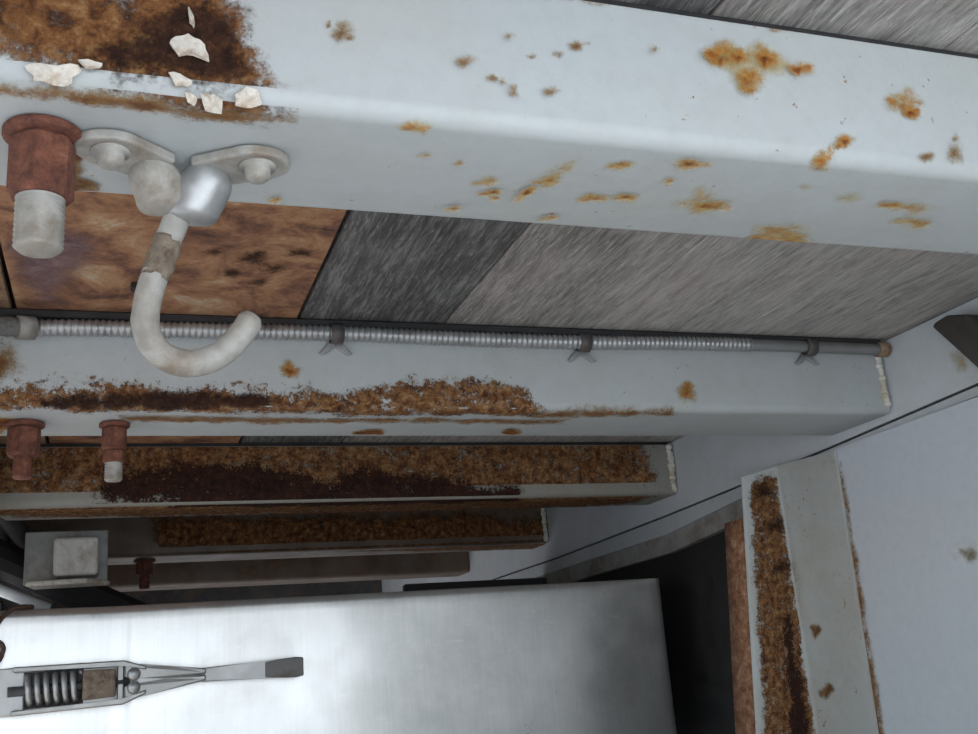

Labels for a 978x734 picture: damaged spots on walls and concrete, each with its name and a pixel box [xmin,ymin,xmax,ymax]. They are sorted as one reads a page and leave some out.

peeling [24,59,102,87]
rust [0,0,290,123]
peeling [169,7,209,62]
peeling [169,72,223,114]
peeling [234,86,262,108]
rust [327,21,352,40]
rust [704,40,813,94]
rust [888,90,922,120]
rust [811,135,853,170]
rust [0,347,675,553]
rust [724,474,834,734]
rust [840,476,884,734]